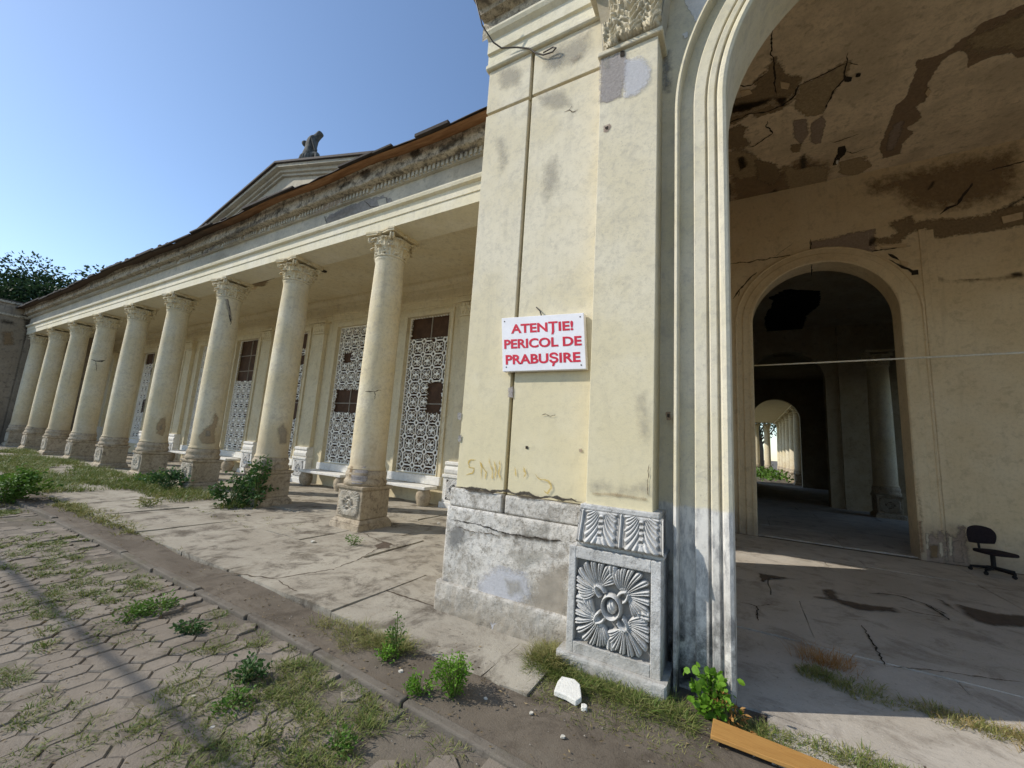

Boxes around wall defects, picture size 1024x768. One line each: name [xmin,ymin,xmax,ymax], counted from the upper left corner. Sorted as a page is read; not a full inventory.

flaking render [599,50,651,103]
flaking render [880,5,1024,158]
flaking render [728,31,872,189]
water stain [869,152,1024,214]
flaking render [809,204,1024,252]
peeling [199,416,218,444]
crack [452,519,570,542]
water stain [816,590,896,612]
water stain [938,599,1024,627]
crack [861,625,1019,682]